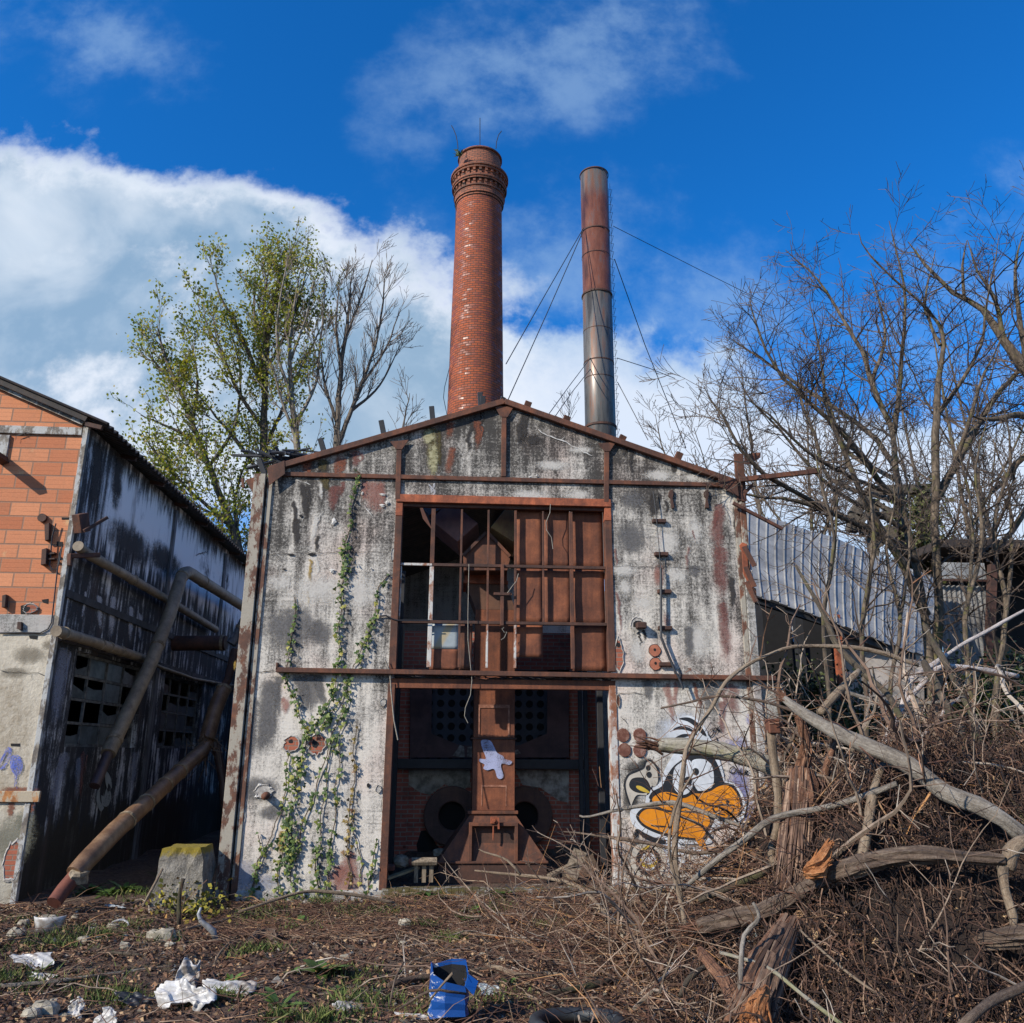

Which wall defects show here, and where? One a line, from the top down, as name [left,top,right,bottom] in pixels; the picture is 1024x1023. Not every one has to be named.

leakage [111,453,124,508]
corrosion [712,505,727,590]
corrosion [719,603,731,653]
leakage [249,674,326,758]
spalling [1,838,23,882]